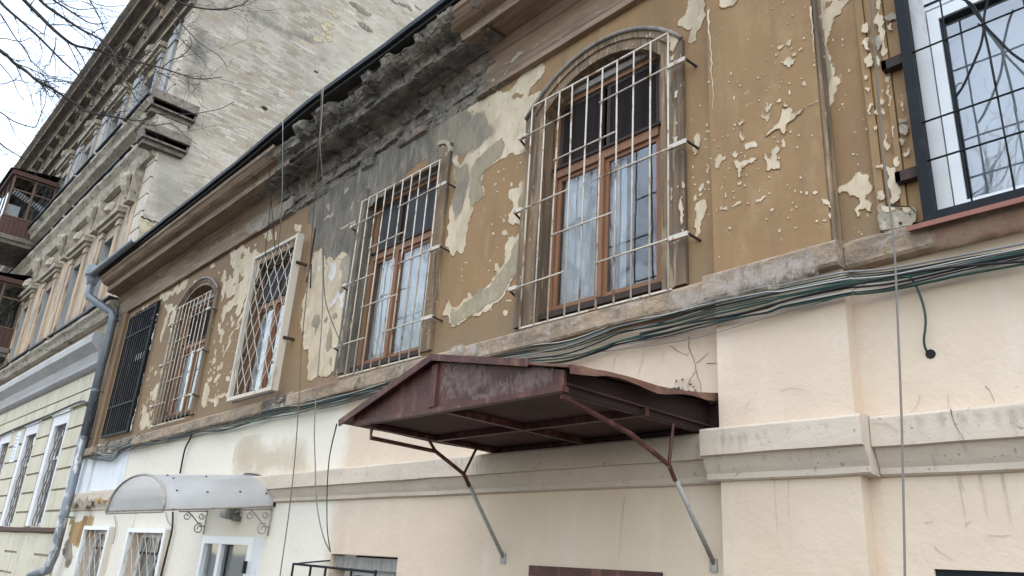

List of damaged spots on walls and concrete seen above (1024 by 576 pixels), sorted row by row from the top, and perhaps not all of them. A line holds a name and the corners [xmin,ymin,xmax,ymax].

peeling [669,0,916,242]
flaking render [201,0,546,408]
peeling [142,278,196,342]
peeling [96,354,167,456]
crack [612,337,712,386]
peeling [62,515,94,568]